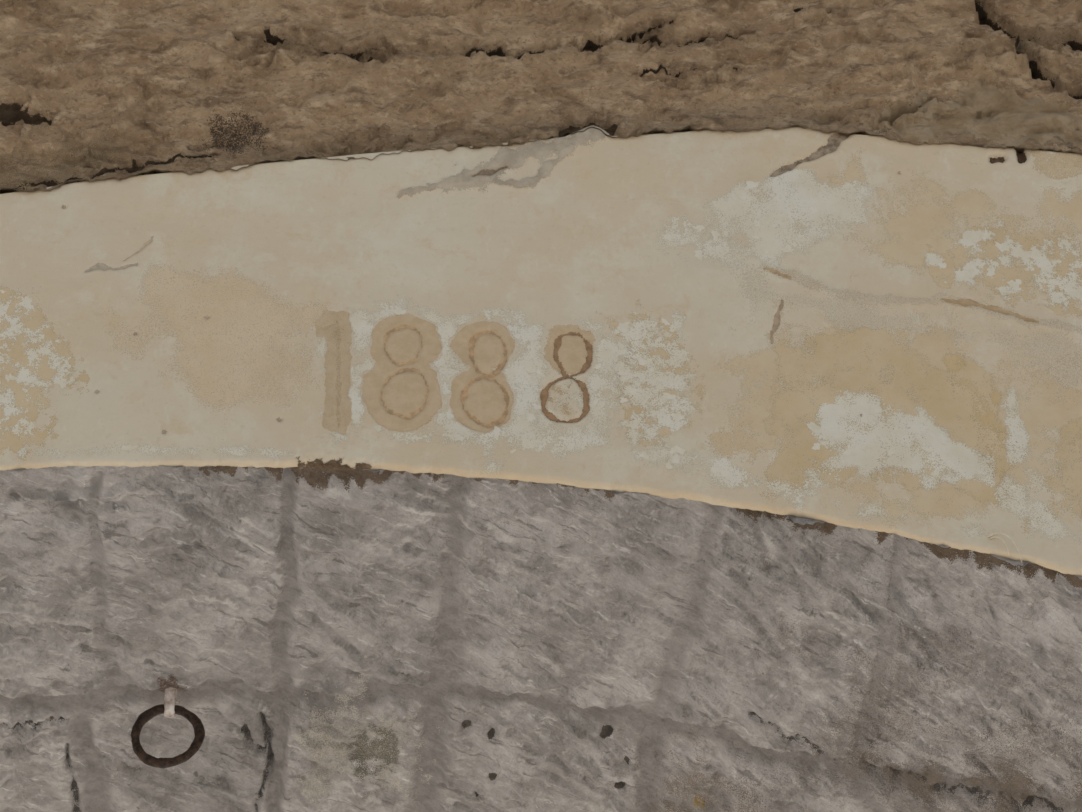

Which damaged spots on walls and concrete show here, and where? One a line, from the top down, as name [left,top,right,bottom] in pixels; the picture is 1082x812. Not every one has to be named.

crack [975,1,1082,100]
peeling [703,164,876,268]
crack [763,267,792,344]
crack [941,298,1039,323]
peeling [912,220,1082,327]
peeling [0,286,100,462]
peeling [296,294,707,479]
peeling [991,386,1082,544]
rust [157,675,190,702]